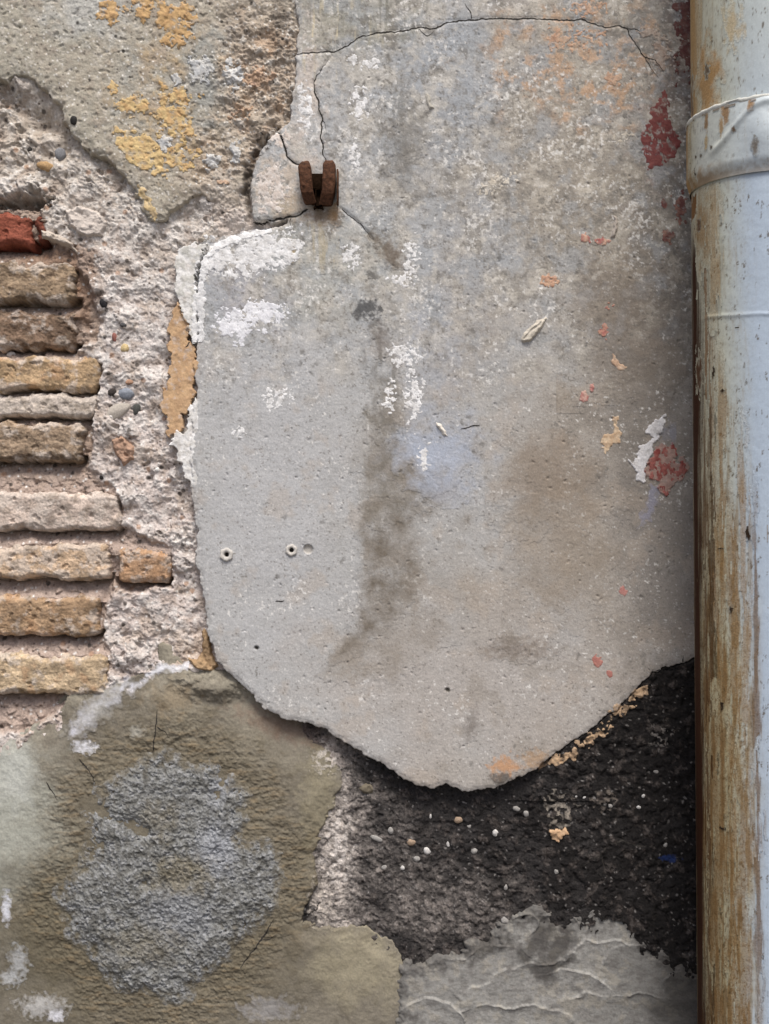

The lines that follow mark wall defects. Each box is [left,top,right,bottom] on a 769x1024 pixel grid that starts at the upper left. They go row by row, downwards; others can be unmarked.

peeling [347,85,372,121]
peeling [346,54,380,71]
crack [295,4,662,159]
peeling [613,0,691,170]
crack [274,129,299,165]
peeling [348,137,361,170]
crack [253,209,308,228]
spalling [0,76,315,754]
damp [313,296,637,686]
peeling [628,414,690,497]
spalling [303,654,697,979]